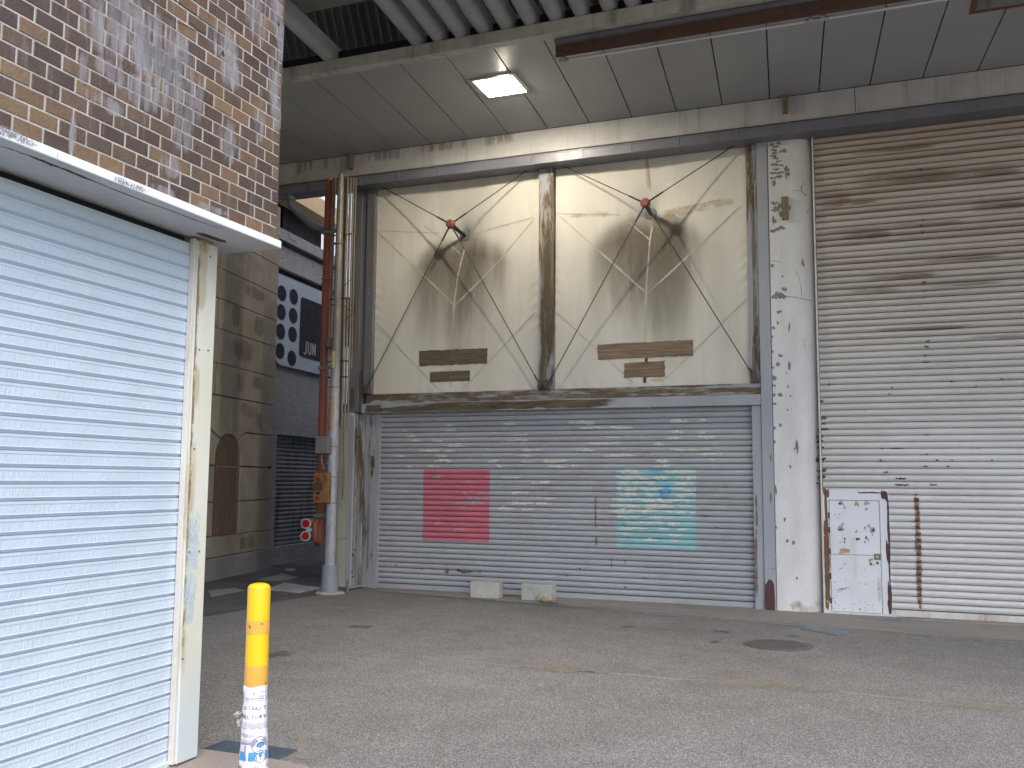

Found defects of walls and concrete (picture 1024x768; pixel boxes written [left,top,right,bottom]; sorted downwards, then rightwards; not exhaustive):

peeling [770,141,790,187]
peeling [770,201,791,233]
peeling [401,424,463,479]
peeling [451,460,553,511]
peeling [504,418,722,542]
rust [816,416,830,610]
peeling [834,500,875,554]
rust [857,490,892,614]
rust [914,494,922,609]